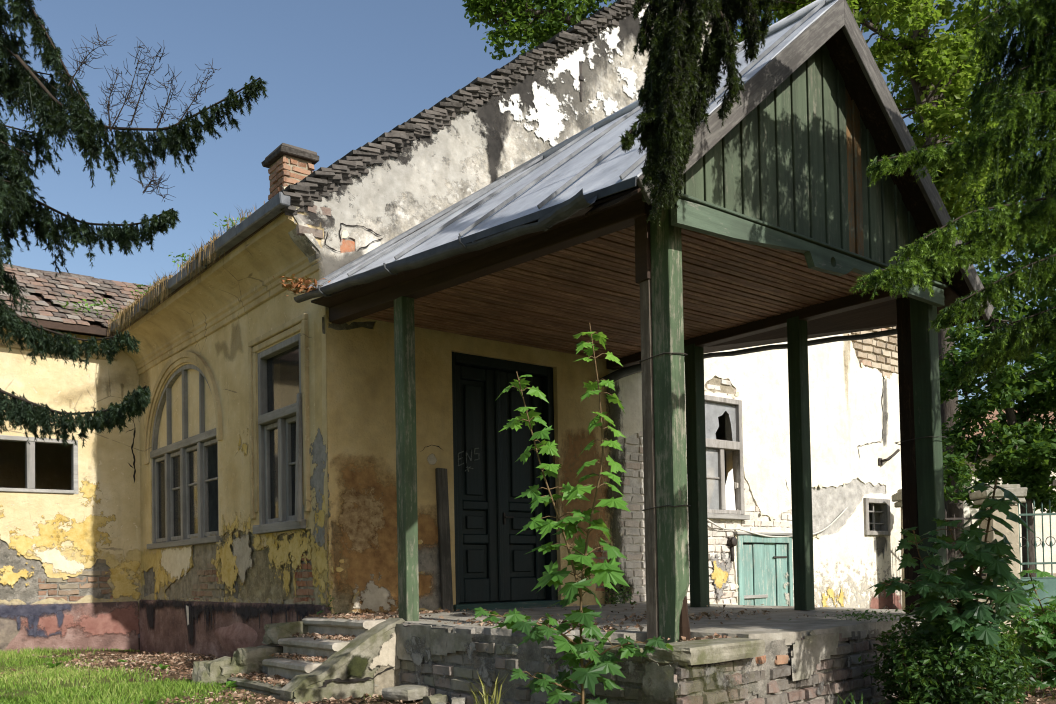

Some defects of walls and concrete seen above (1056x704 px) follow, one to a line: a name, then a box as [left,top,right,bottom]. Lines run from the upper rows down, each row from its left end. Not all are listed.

damp [303,3,652,228]
peeling [499,26,638,147]
crack [325,223,384,252]
peeling [292,111,491,254]
flaking render [704,376,739,398]
flaking render [848,326,898,379]
flaking render [0,428,398,637]
flaking render [593,431,646,603]
flaking render [708,479,792,605]
flaking render [812,478,885,539]
damp [0,603,72,637]
damp [140,599,315,646]